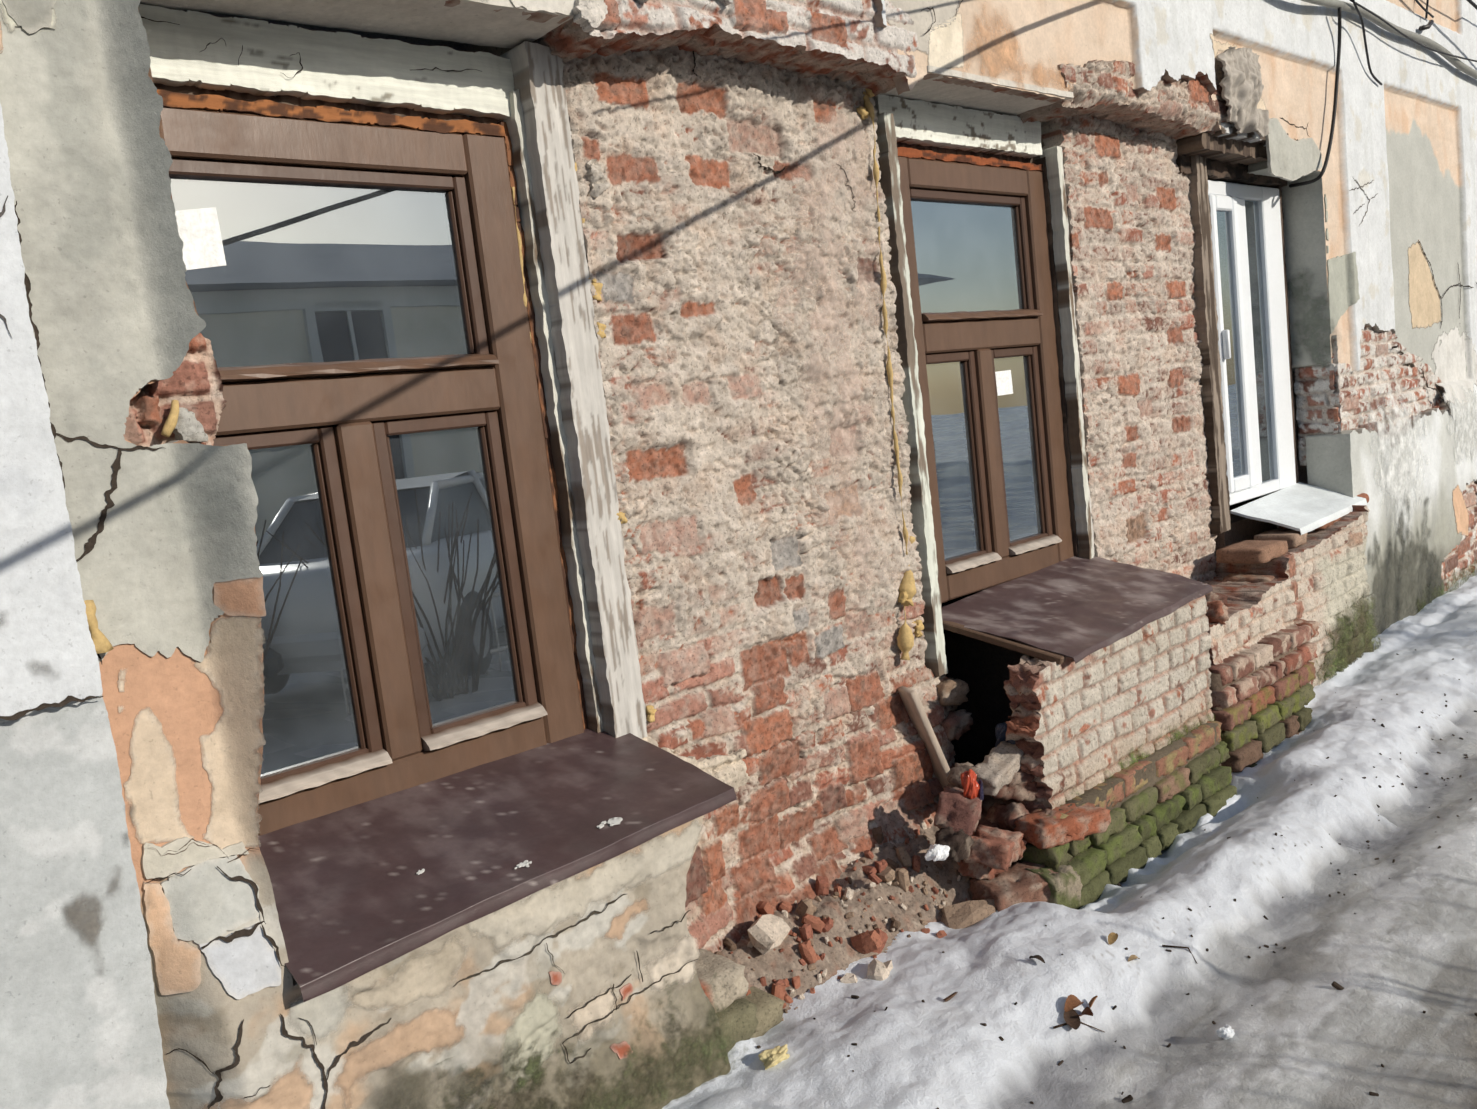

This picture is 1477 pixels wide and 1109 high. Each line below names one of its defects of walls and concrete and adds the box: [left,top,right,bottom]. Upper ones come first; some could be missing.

crack [0,195,166,562]
spalling [123,333,227,447]
spalling [290,0,964,1109]
spalling [1017,34,1237,583]
spalling [1294,239,1477,466]
damp [1368,394,1442,634]
damp [1444,398,1477,463]
crack [0,630,103,721]
peeling [118,576,266,856]
crack [453,894,626,987]
crack [166,1019,271,1109]
crack [280,1014,392,1109]